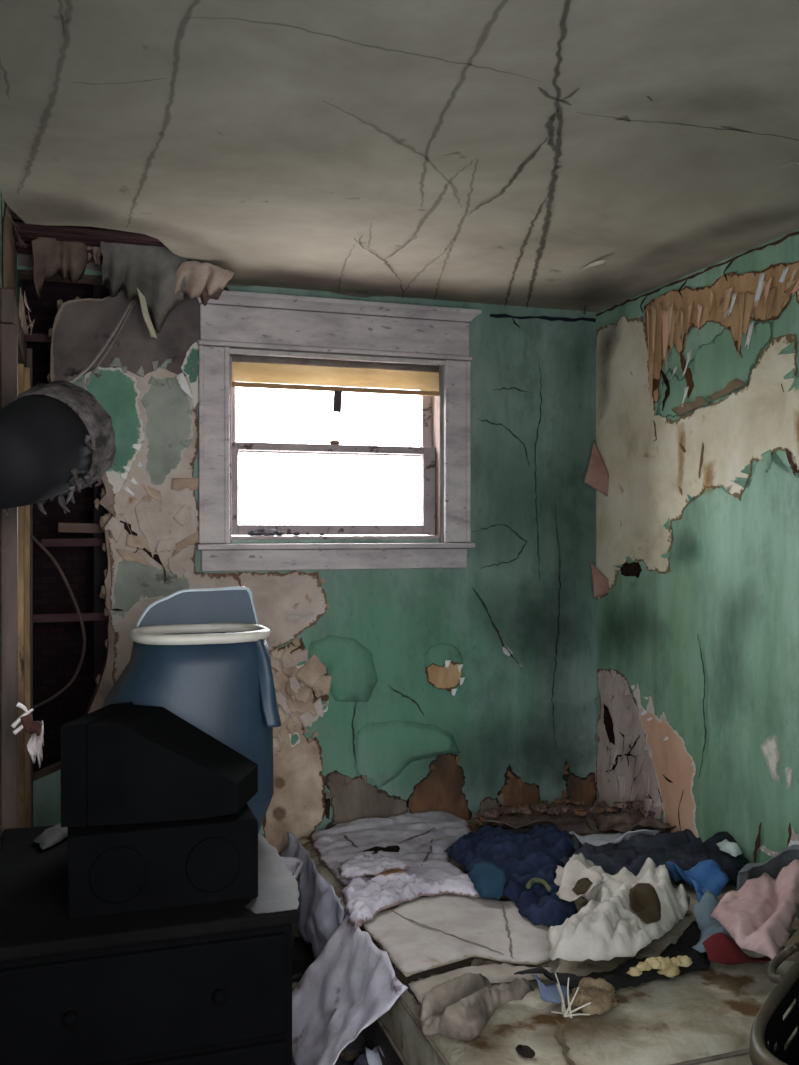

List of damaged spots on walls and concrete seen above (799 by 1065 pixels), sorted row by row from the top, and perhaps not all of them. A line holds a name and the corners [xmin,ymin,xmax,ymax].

peeling [754,273,765,302]
spalling [23,279,332,855]
crack [472,362,561,741]
peeling [592,316,799,600]
peeling [591,668,699,838]
peeling [759,826,799,857]